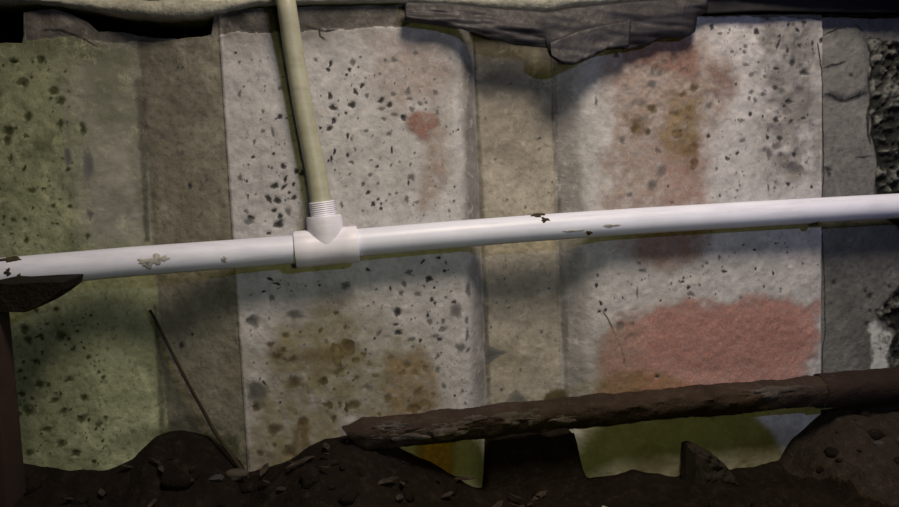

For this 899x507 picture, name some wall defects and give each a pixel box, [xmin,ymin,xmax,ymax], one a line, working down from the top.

rust [409,112,445,174]
crack [817,25,871,192]
spalling [866,38,899,194]
rust [598,296,821,394]
spalling [857,280,899,367]